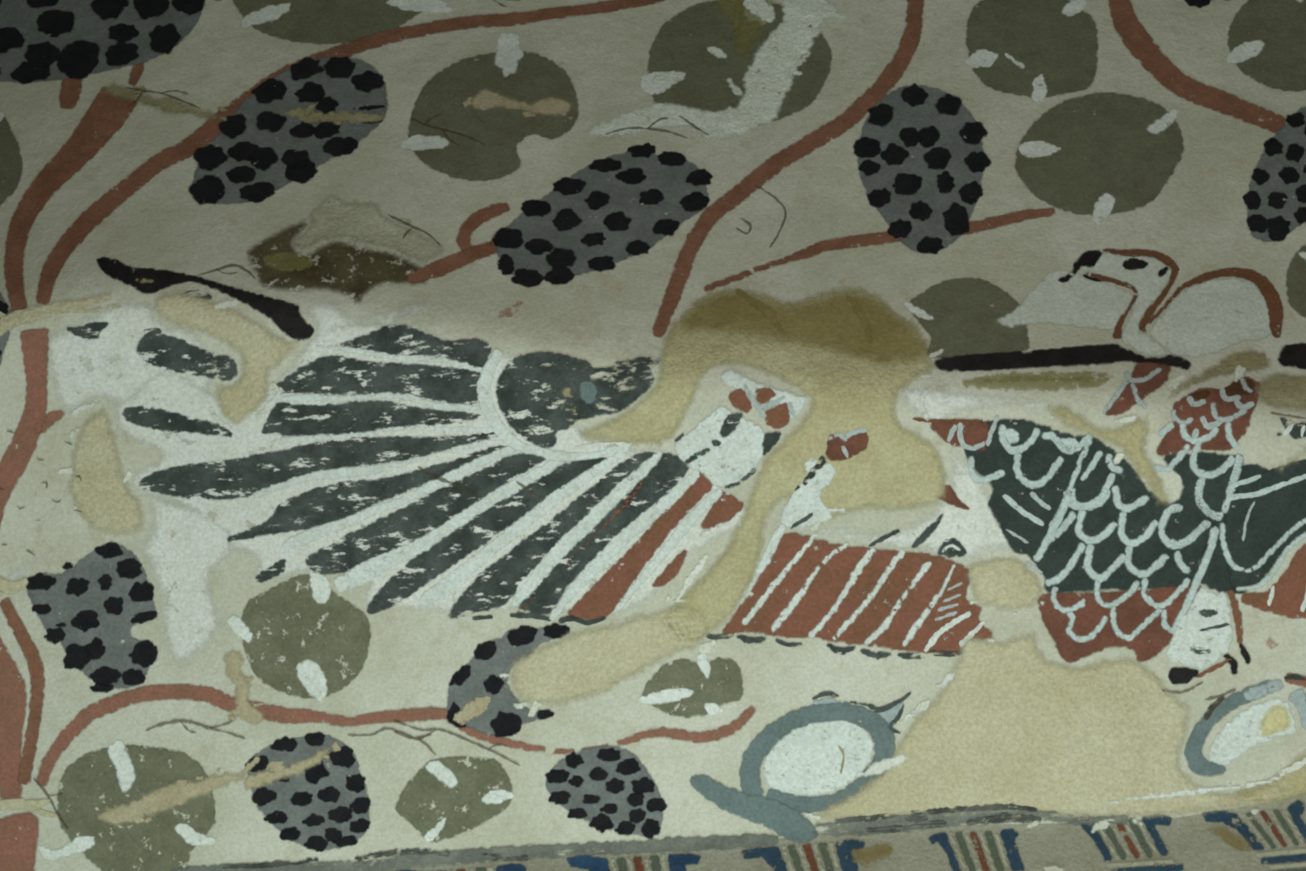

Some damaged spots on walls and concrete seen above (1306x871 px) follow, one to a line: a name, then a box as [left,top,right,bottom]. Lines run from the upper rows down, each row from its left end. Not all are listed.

peeling [589,0,838,145]
peeling [698,640,716,654]